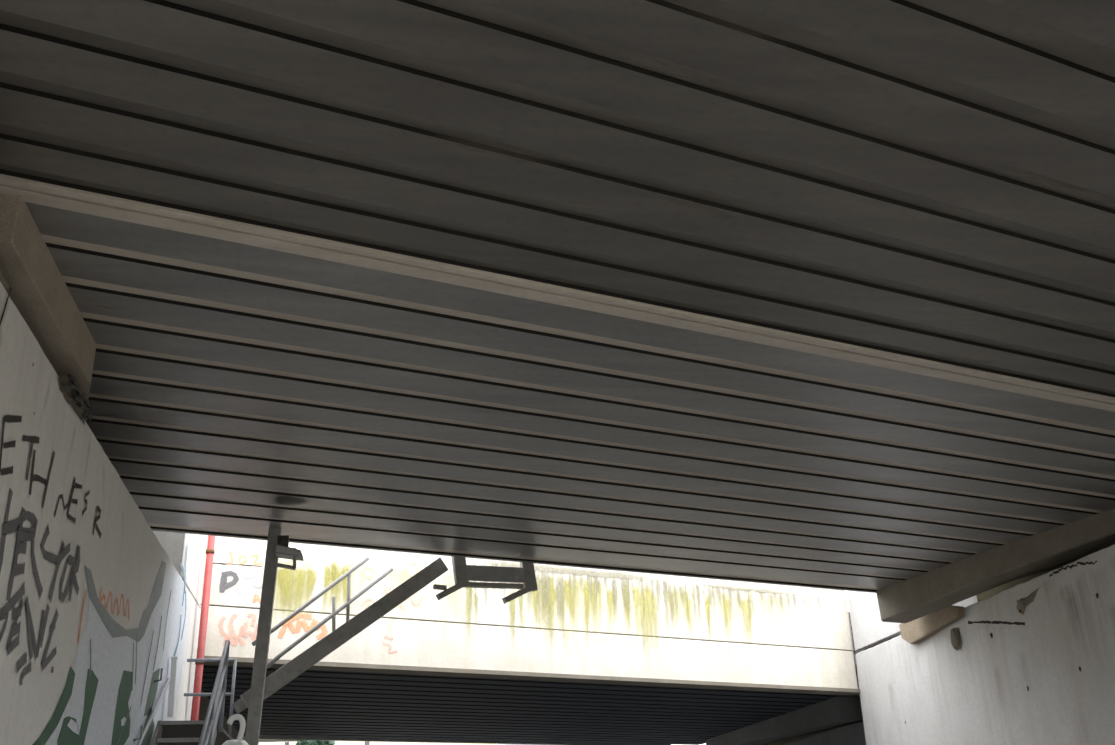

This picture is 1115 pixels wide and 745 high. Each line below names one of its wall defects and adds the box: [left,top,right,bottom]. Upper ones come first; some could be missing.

damp [467,581,505,613]
damp [510,564,819,624]